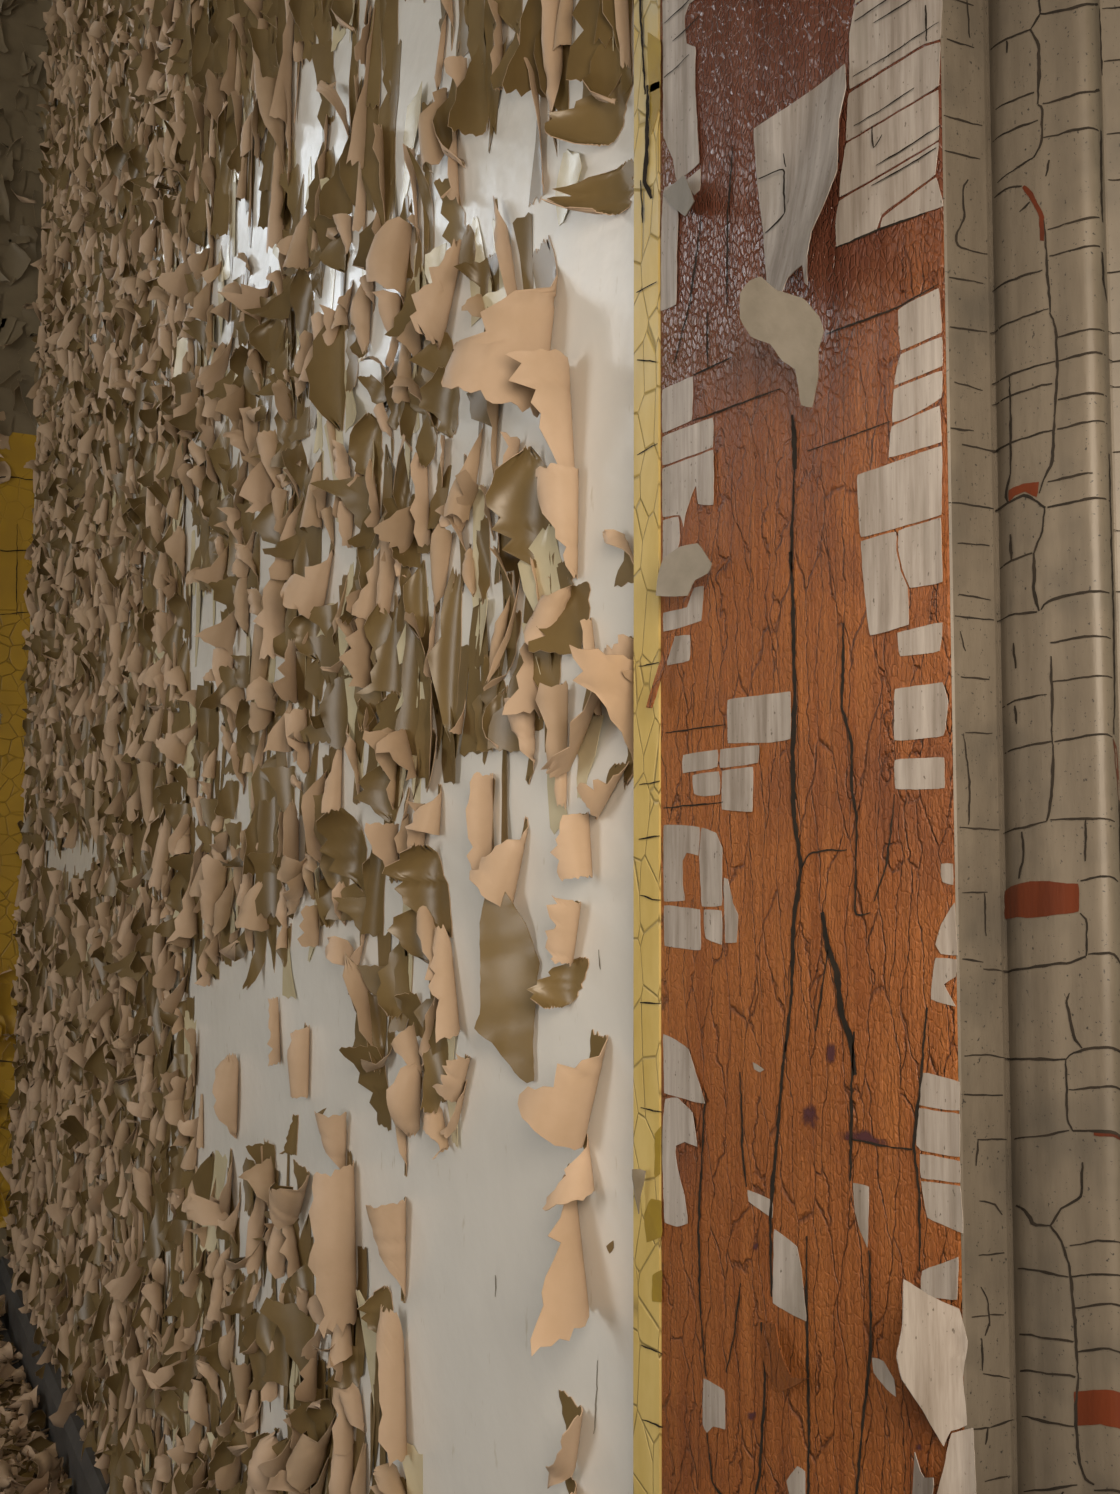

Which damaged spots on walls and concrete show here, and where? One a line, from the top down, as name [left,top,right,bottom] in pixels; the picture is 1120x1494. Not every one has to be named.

crack [636,146,786,375]
peeling [740,0,943,407]
peeling [646,376,714,708]
peeling [857,288,943,656]
peeling [0,0,705,1494]
crack [639,781,722,840]
crack [666,724,725,733]
peeling [682,692,791,812]
crack [692,388,928,1494]
crack [826,0,1120,1494]
crack [591,1360,599,1434]
peeling [872,1257,976,1494]